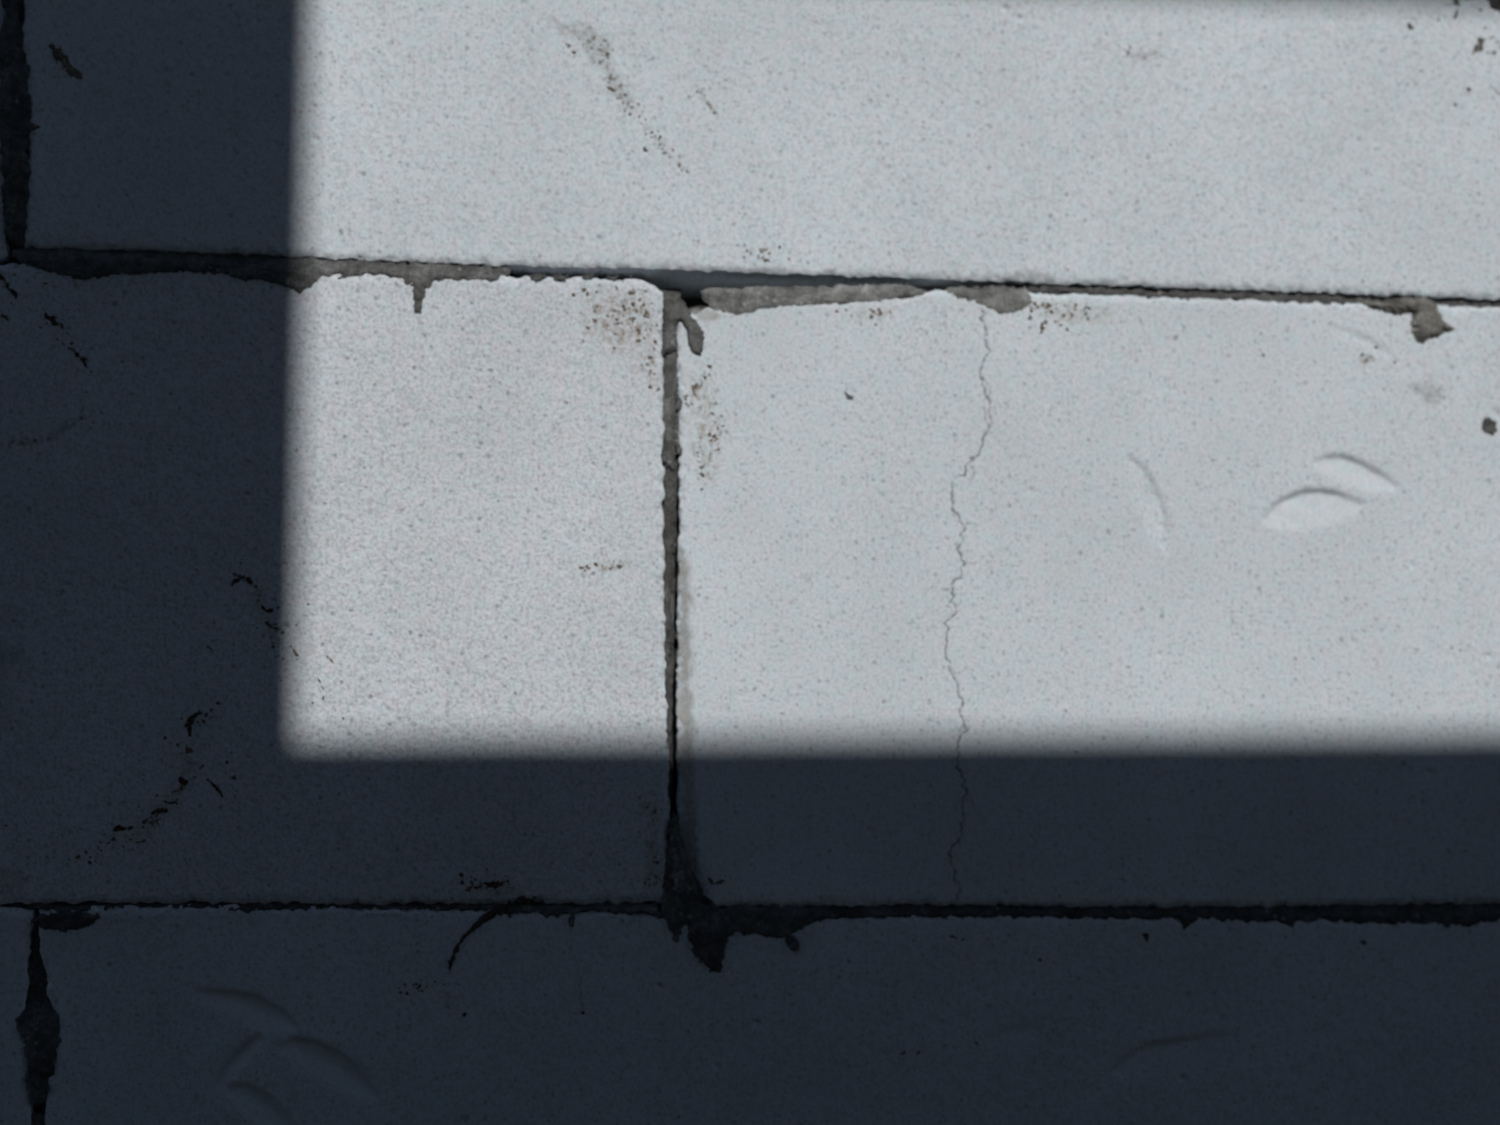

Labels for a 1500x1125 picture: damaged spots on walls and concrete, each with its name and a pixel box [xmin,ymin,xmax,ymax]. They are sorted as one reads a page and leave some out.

spalling [1472,0,1500,55]
crack [944,310,993,900]
corrosion [53,701,236,865]